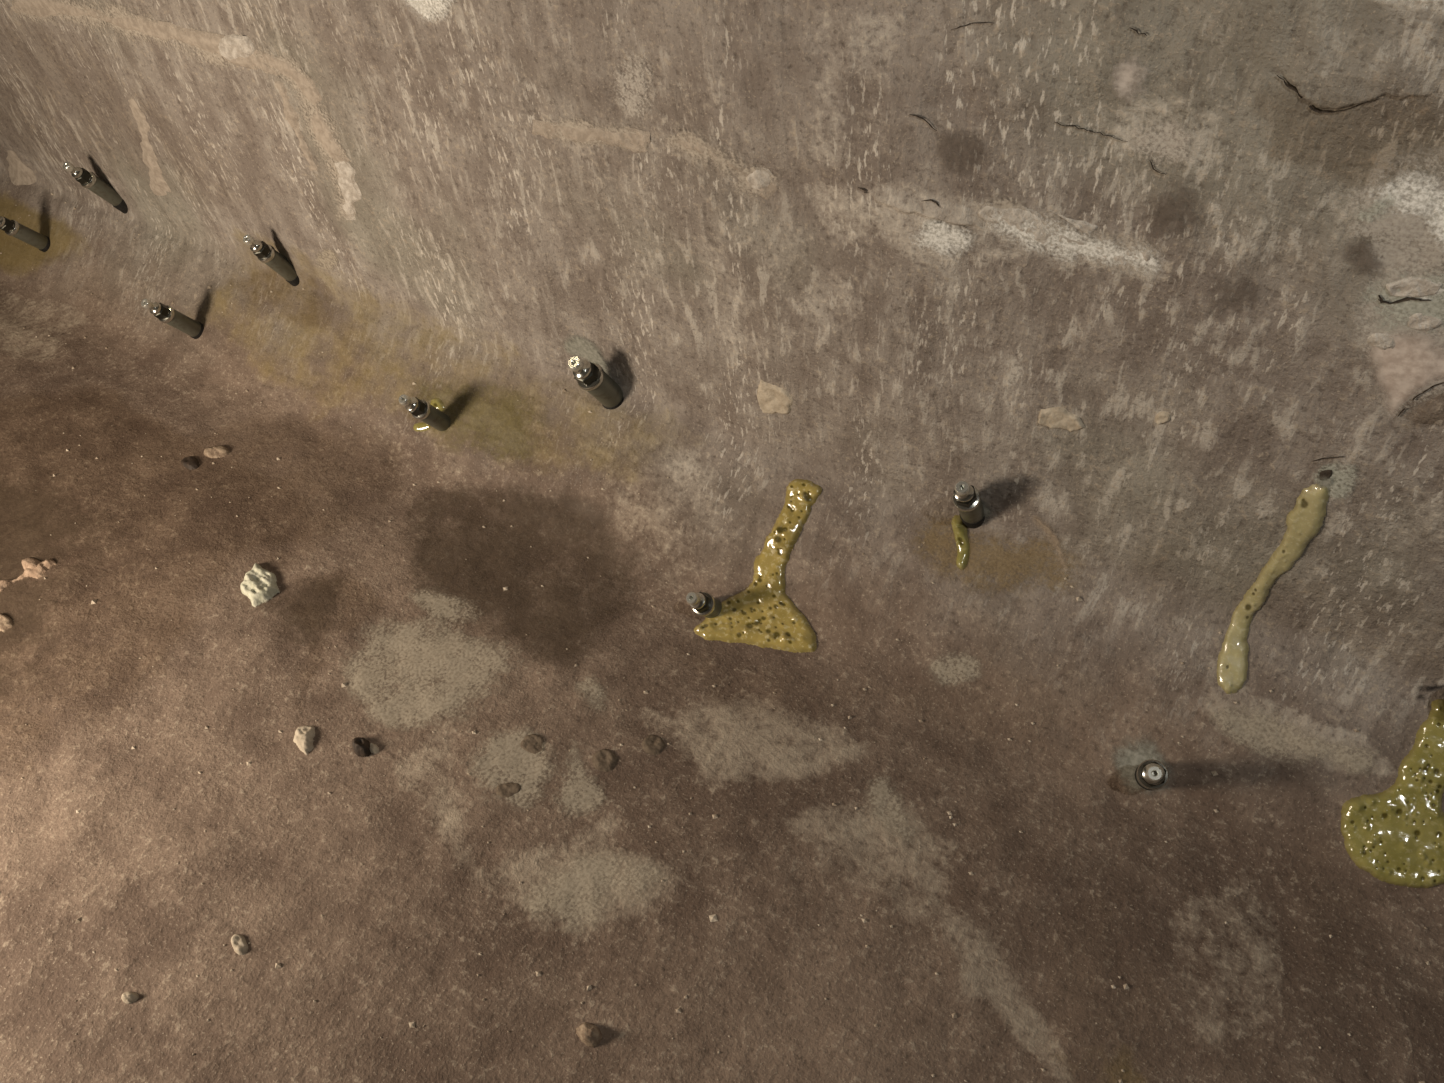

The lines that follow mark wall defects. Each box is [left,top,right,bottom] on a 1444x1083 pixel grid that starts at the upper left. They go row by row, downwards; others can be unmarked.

crack [858,187,967,228]
crack [1378,295,1431,304]
leakage [346,494,610,728]